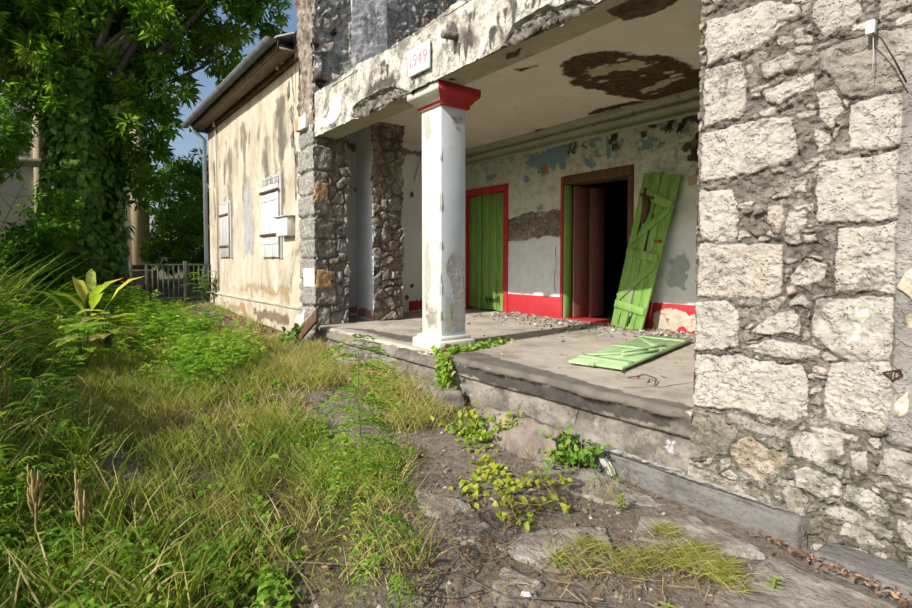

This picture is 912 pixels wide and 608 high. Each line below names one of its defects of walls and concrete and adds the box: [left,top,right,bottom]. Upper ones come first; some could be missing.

spalling [507,3,596,46]
spalling [607,0,678,21]
spalling [353,89,412,118]
peeling [582,58,685,115]
leakage [213,150,232,217]
leakage [240,126,250,171]
leakage [262,96,286,203]
peeling [524,144,570,183]
leakage [245,279,291,325]
flaking render [439,241,466,351]
flaking render [897,268,912,300]
flaking render [893,392,909,418]